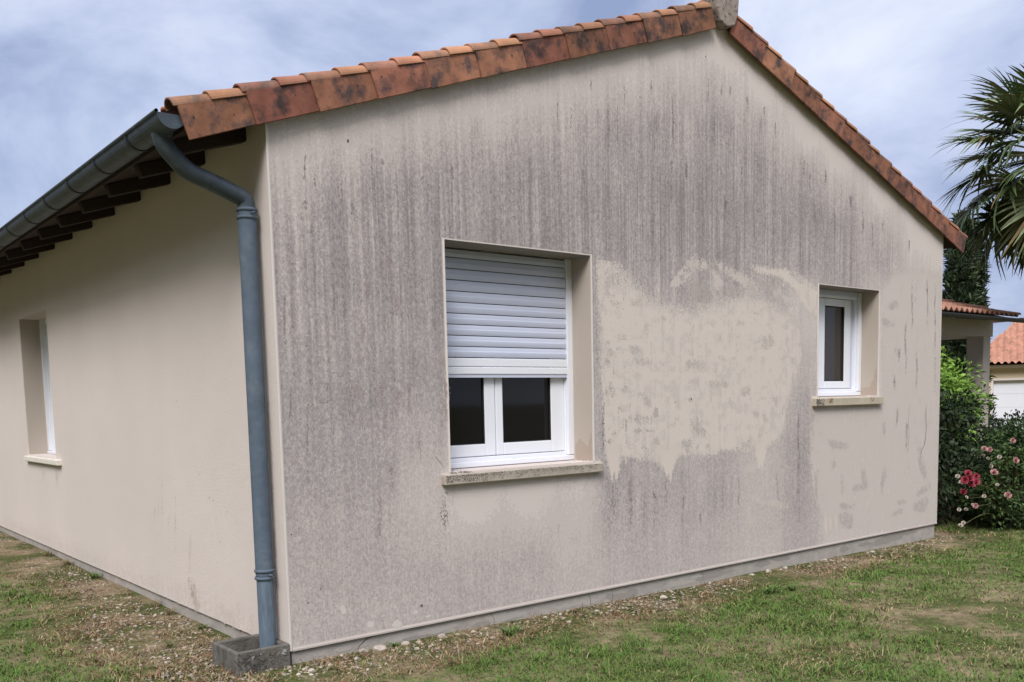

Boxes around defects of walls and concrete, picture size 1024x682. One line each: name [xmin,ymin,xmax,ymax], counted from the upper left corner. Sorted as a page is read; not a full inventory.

leakage [266,397,274,507]
leakage [575,404,605,461]
leakage [662,567,735,588]
leakage [753,555,790,568]